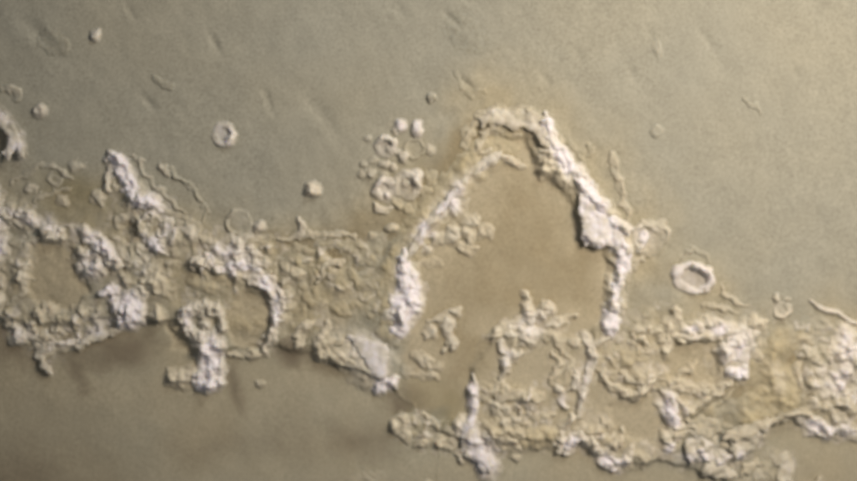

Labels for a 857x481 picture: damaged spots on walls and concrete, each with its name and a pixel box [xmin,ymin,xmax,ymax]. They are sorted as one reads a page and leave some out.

peeling [0,101,857,481]
efflorescence [451,372,504,481]